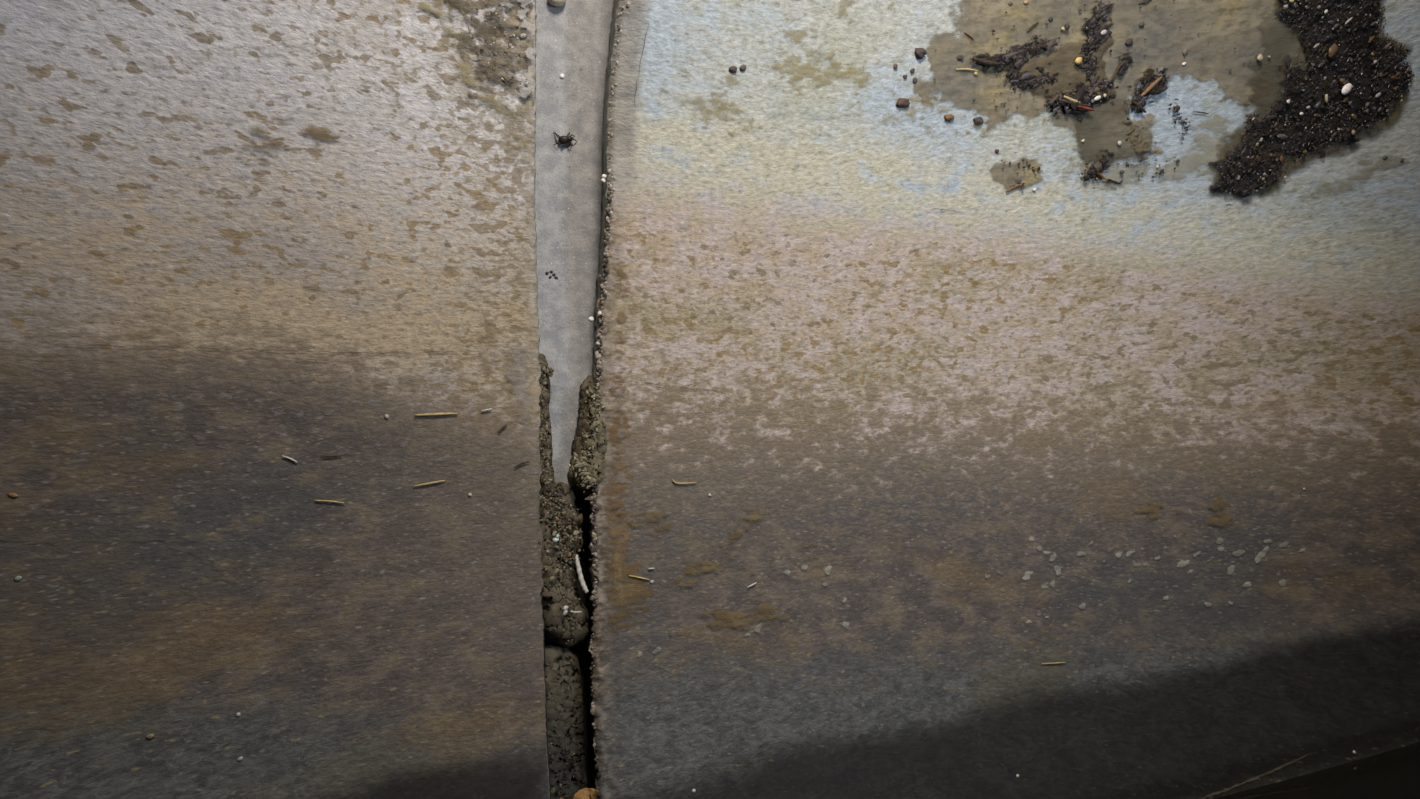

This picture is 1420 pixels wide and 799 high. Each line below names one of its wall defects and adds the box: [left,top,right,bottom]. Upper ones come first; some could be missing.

spalling [418,0,535,112]
damp [885,0,1411,202]